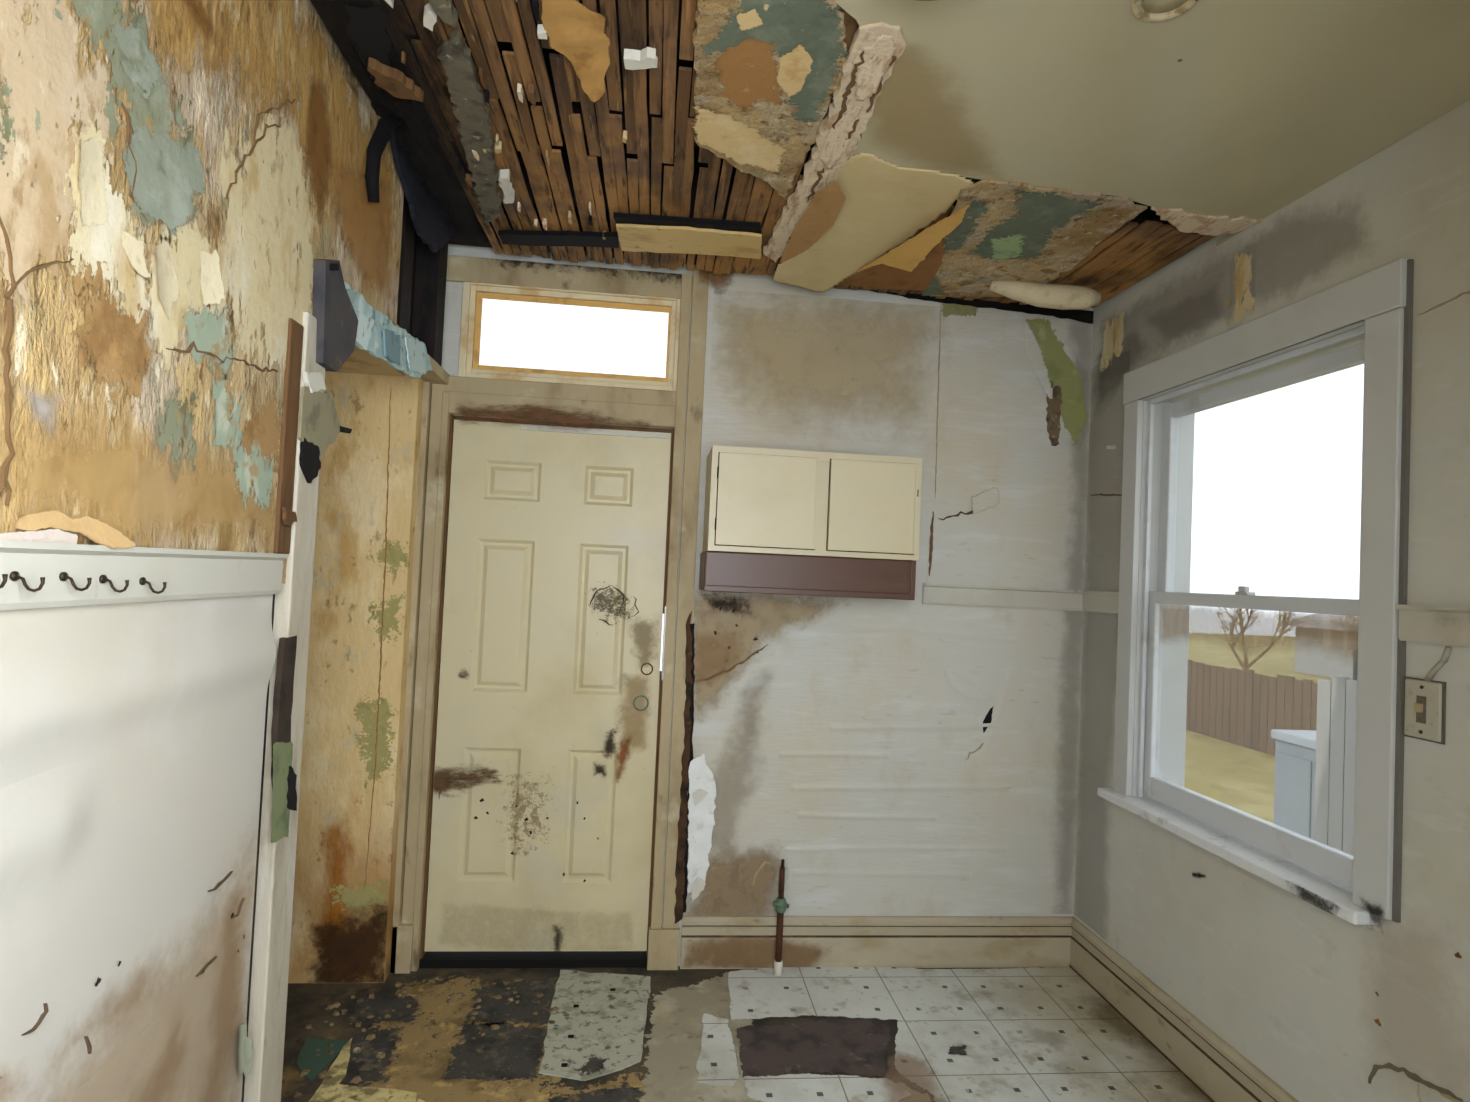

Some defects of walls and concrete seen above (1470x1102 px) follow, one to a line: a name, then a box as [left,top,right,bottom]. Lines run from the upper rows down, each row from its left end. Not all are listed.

crack [225,99,296,199]
flaking render [763,22,906,263]
crack [0,217,74,505]
peeling [0,0,352,527]
crack [166,341,278,372]
peeling [344,282,433,378]
peeling [940,303,979,318]
peeling [1024,318,1087,446]
leakage [694,596,824,708]
leakage [311,827,388,983]
leakage [692,854,778,916]
crack [1368,1063,1463,1102]